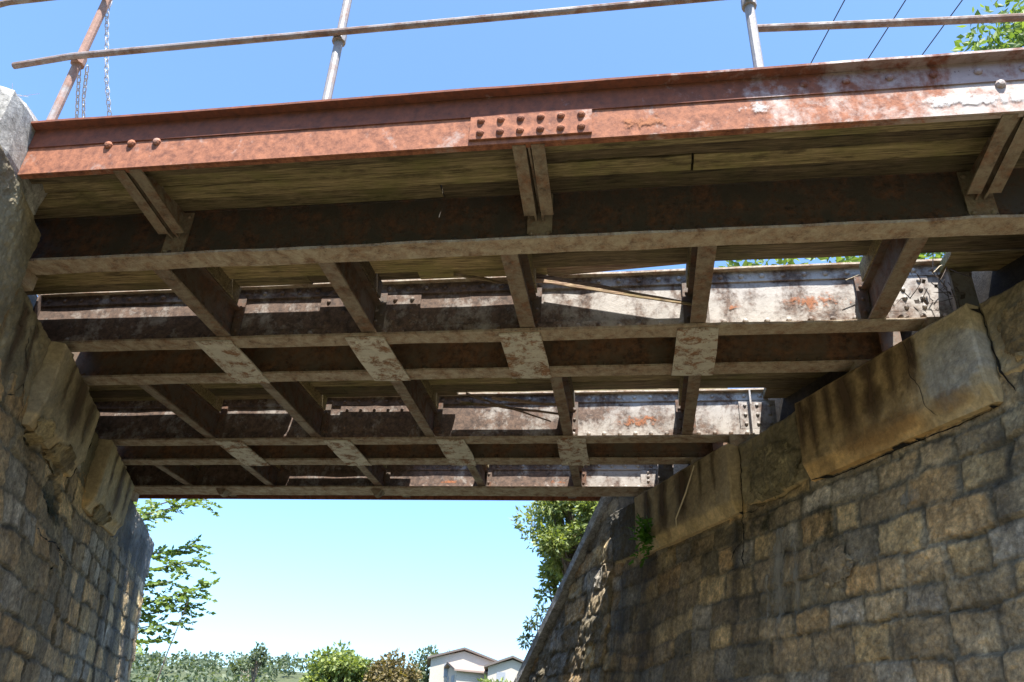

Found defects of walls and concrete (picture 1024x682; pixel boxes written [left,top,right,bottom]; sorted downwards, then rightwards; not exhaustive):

corrosion [783,292,837,312]
crack [812,308,1016,480]
corrosion [617,415,657,426]